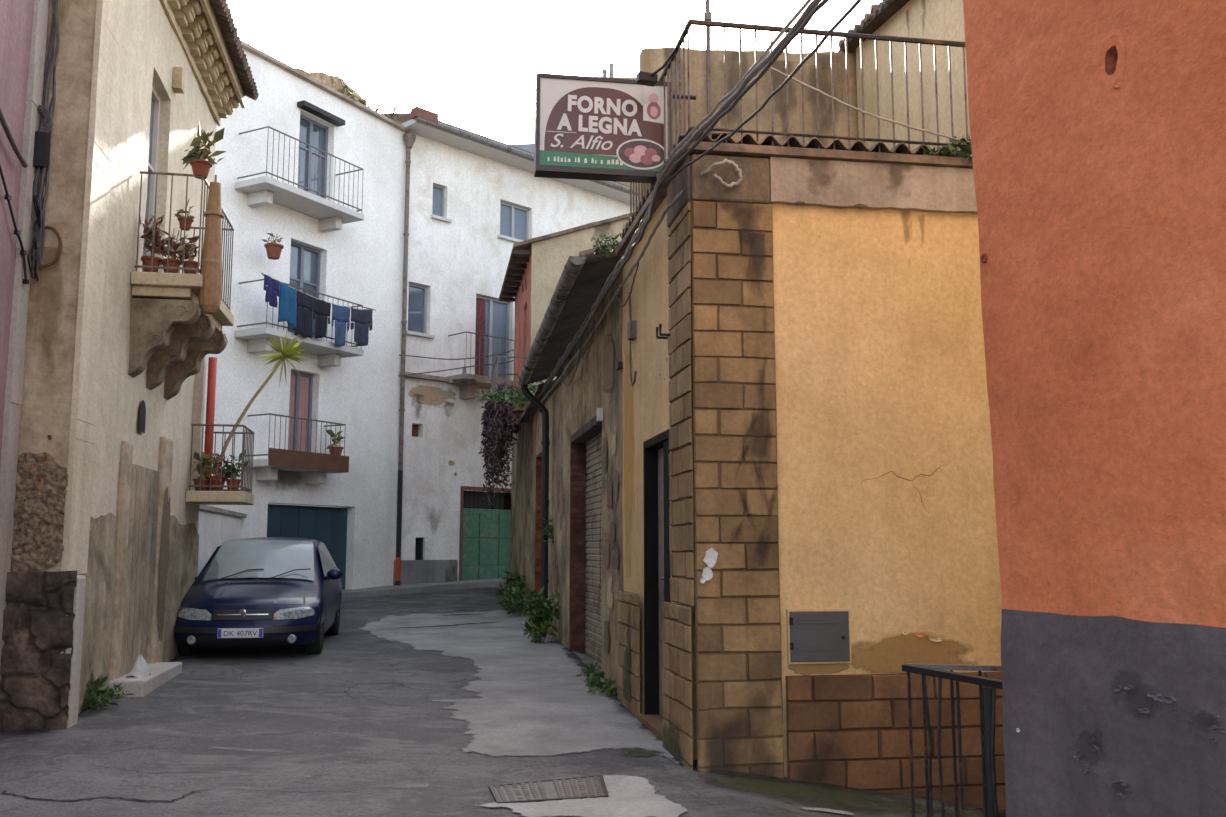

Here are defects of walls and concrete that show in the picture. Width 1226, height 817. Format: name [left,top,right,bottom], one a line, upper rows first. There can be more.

peeling [410,385,455,414]
crack [862,465,943,513]
water stain [789,631,969,675]